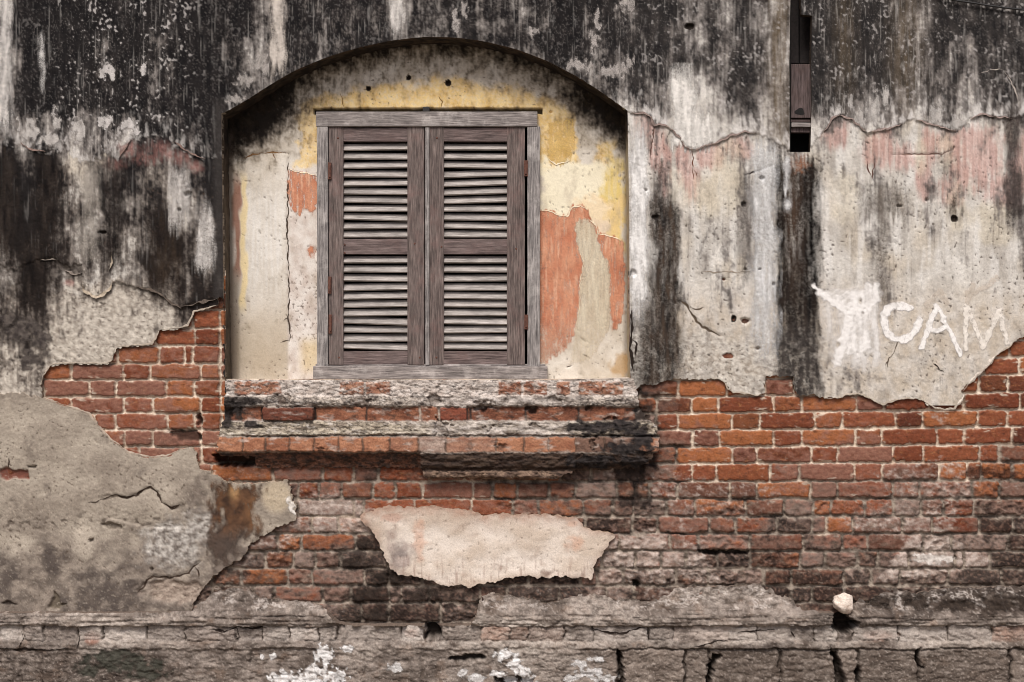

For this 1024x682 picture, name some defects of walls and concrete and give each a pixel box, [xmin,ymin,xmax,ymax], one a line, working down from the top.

leakage [99,64,115,81]
leakage [225,0,287,164]
leakage [566,8,635,79]
leakage [0,0,85,370]
peeling [287,169,317,216]
peeling [540,204,626,363]
leakage [564,65,714,508]
leakage [741,138,822,398]
crack [92,486,184,510]
spalling [40,286,1024,628]
leakage [260,642,354,682]
leakage [457,648,538,682]